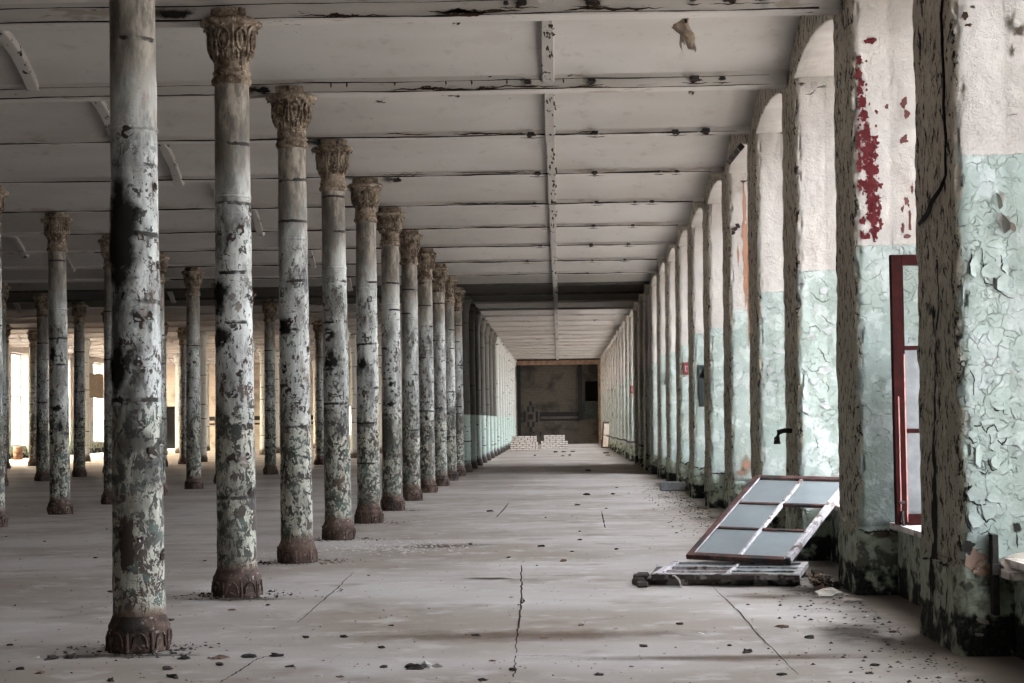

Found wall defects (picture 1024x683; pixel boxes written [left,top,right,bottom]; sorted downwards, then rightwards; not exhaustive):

peeling [115,125,133,140]
peeling [834,37,884,242]
peeling [226,206,252,244]
peeling [131,287,153,329]
peeling [227,278,254,311]
crack [969,250,1013,299]
peeling [227,452,251,468]
crack [512,566,525,677]
crack [711,585,798,674]